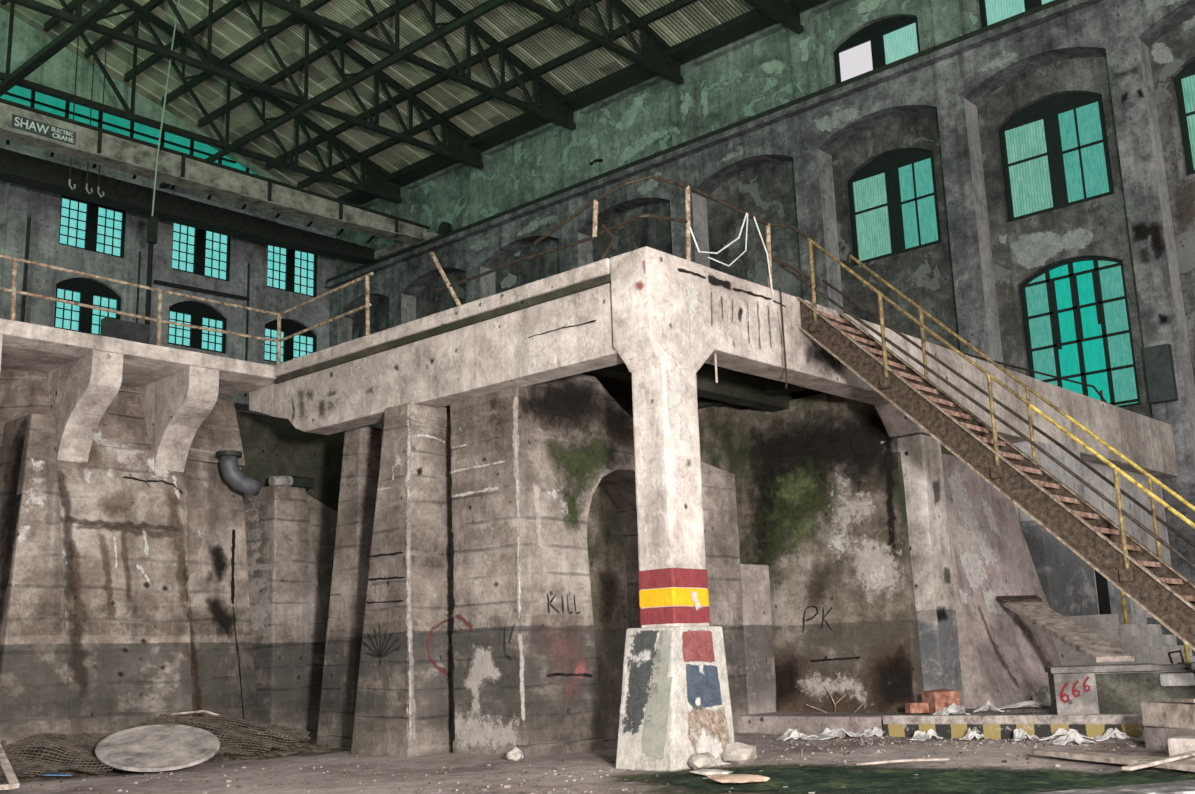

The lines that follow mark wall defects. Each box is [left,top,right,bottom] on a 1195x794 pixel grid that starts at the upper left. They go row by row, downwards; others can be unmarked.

flaking render [614,93,668,166]
flaking render [680,90,708,117]
flaking render [719,146,743,163]
flaking render [757,59,785,88]
flaking render [799,36,810,62]
flaking render [813,105,859,132]
water stain [451,377,634,618]
water stain [749,411,904,603]
water stain [58,431,205,728]
peeling [455,647,519,750]